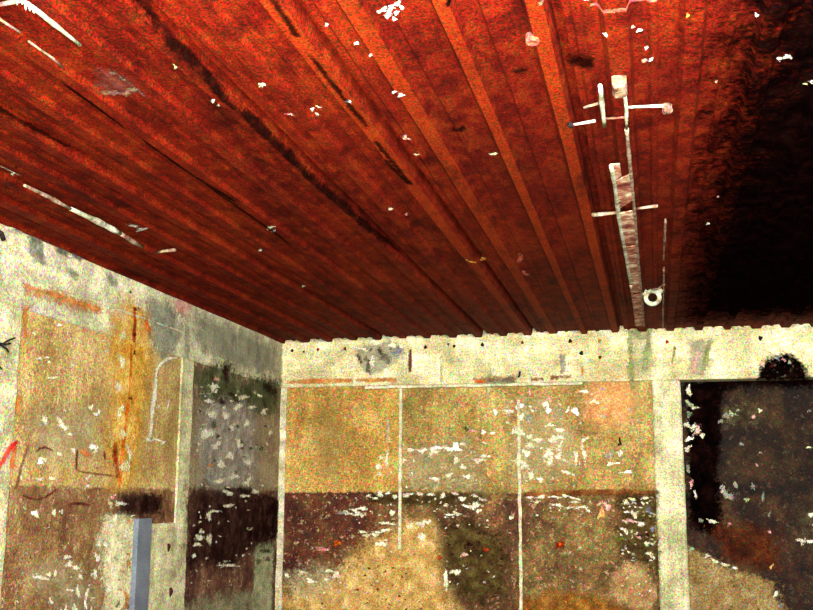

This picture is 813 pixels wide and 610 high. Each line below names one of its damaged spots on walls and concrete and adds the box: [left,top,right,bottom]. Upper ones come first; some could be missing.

water stain [590,0,657,13]
rust [102,291,155,491]
water stain [181,485,279,583]
peeling [195,376,273,494]
flaking render [185,426,495,610]
peeling [493,396,662,610]